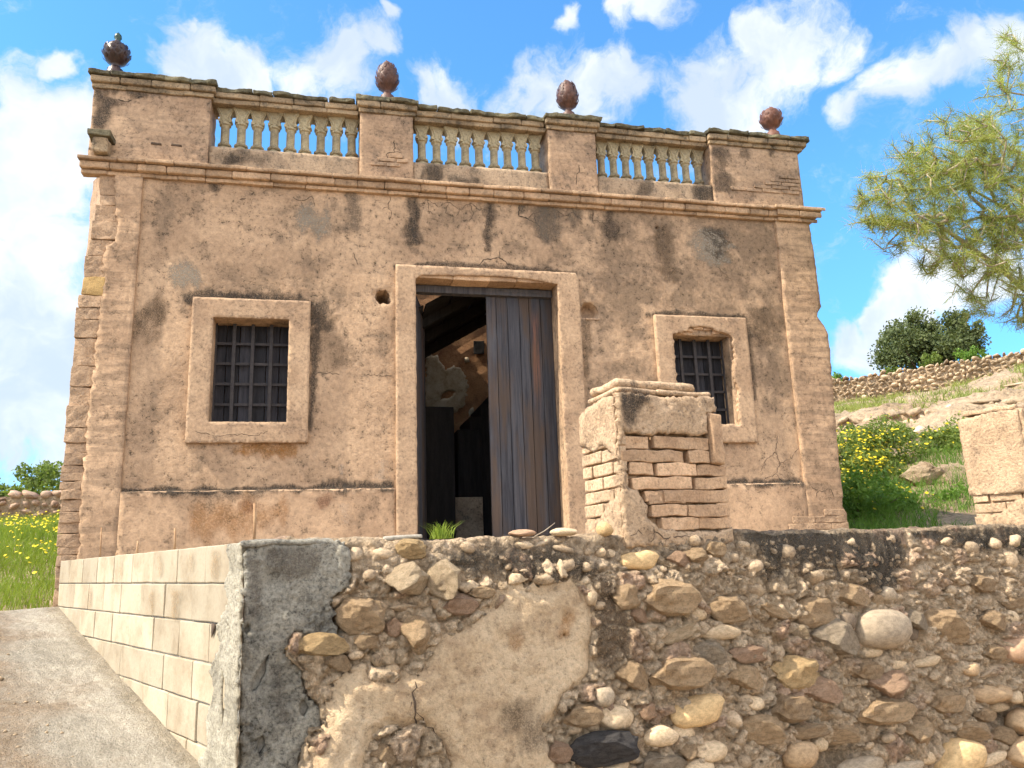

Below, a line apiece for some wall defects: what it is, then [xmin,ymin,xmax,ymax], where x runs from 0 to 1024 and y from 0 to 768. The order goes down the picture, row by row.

leakage [405,197,423,244]
leakage [483,202,494,251]
leakage [534,206,574,242]
leakage [184,290,332,431]
leakage [621,382,650,422]
leakage [121,479,394,496]
flaking render [611,392,734,549]
leakage [744,527,1024,588]
flaking render [302,559,599,768]
crack [410,682,436,734]